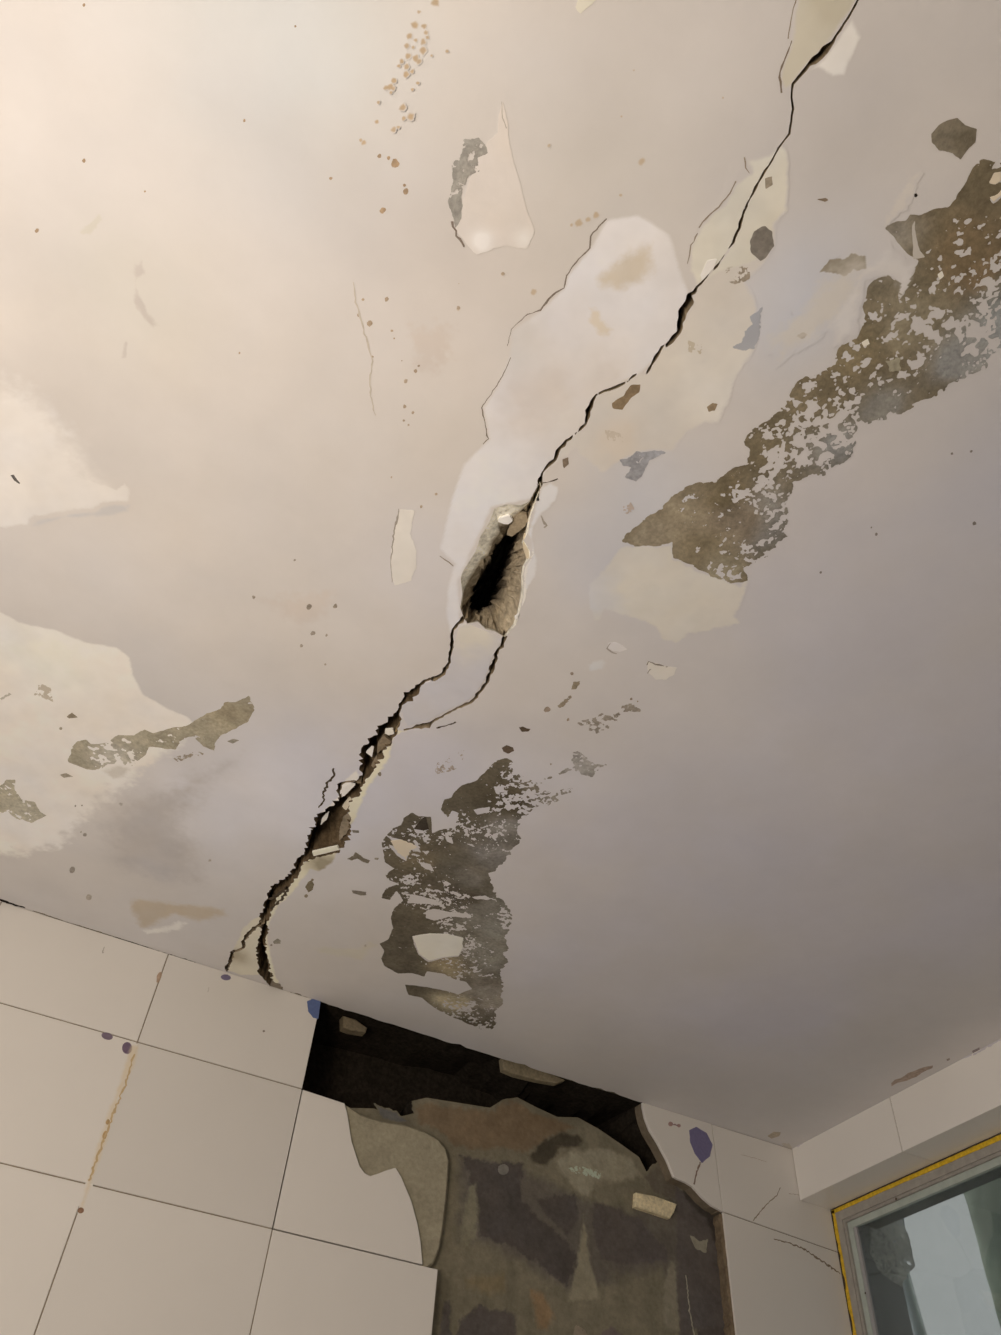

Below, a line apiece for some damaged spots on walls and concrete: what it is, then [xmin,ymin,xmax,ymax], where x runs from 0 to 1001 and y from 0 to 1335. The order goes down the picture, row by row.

peeling [778,0,862,93]
crack [533,0,859,494]
peeling [401,102,1001,734]
crack [34,911,193,962]
peeling [0,611,254,863]
crack [225,601,507,990]
peeling [348,745,606,1029]
spalling [301,1001,657,1171]